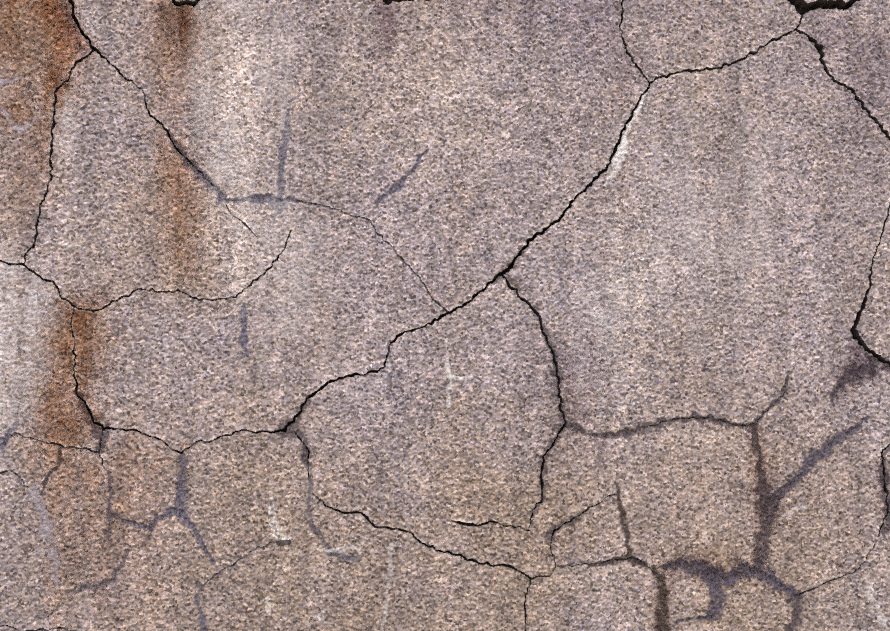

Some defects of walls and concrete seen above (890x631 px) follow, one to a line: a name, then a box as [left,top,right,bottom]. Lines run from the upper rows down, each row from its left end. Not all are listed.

crack [619,0,890,140]
crack [0,0,651,528]
crack [850,204,890,367]
crack [644,377,789,428]
crack [0,623,77,631]
crack [205,541,274,584]
crack [313,493,660,631]
crack [797,444,890,597]